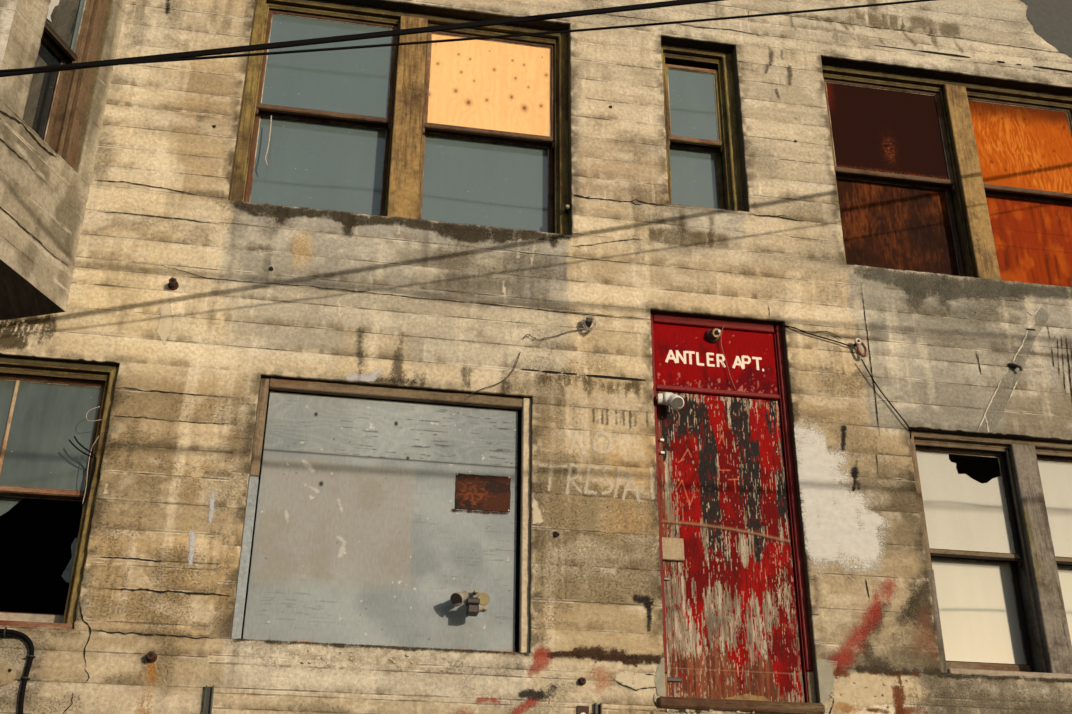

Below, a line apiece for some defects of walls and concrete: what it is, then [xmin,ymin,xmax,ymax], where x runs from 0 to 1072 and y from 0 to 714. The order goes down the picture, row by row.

damp [230,200,571,248]
damp [853,266,1072,312]
crack [63,604,209,714]